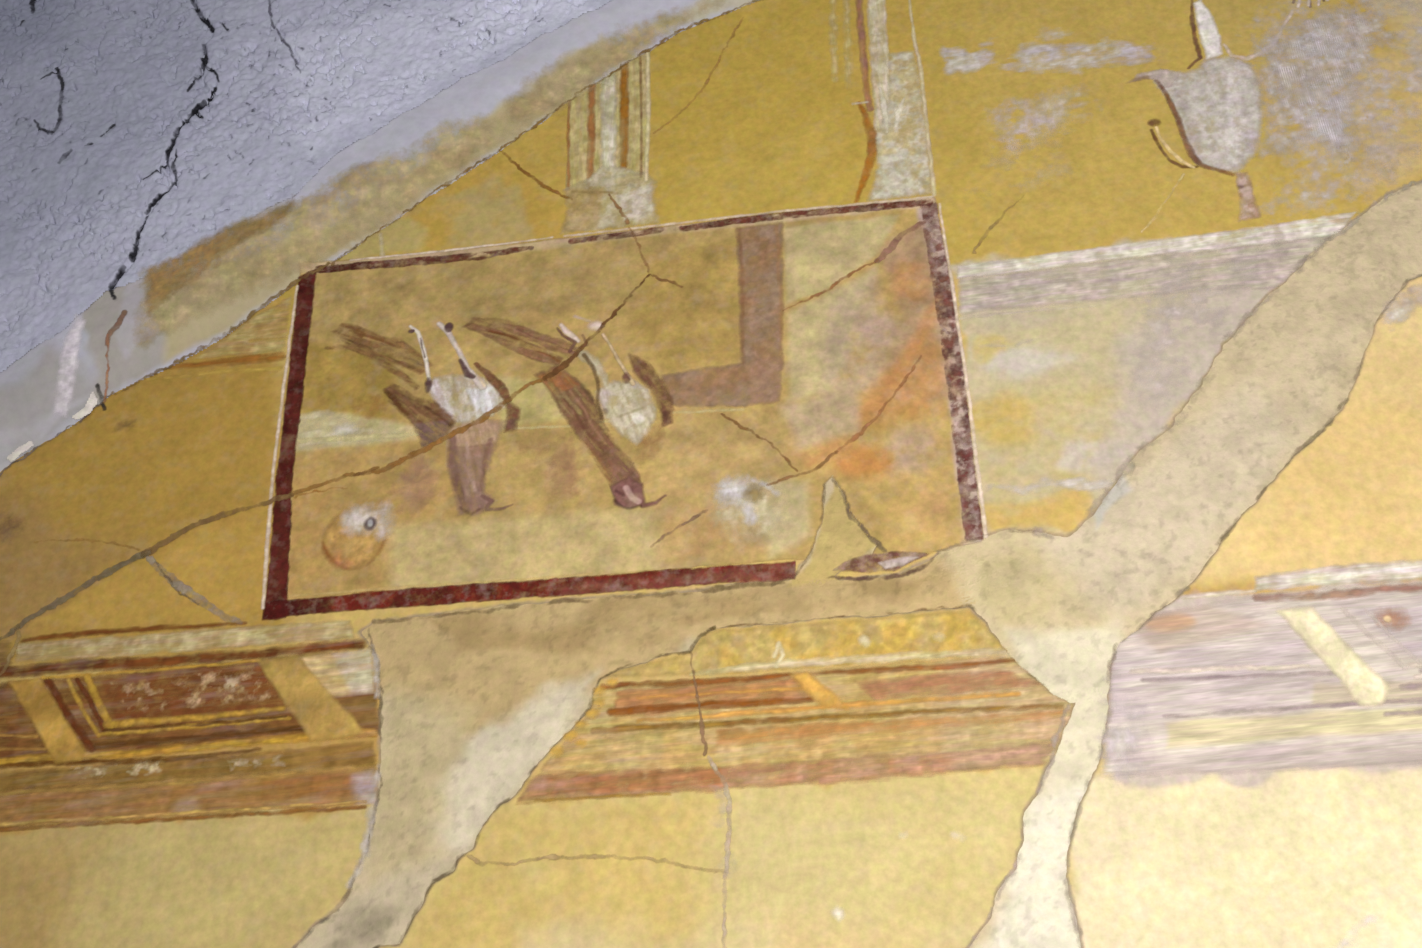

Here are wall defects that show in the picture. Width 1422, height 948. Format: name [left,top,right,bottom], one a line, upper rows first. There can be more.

crack [0,0,759,476]
crack [783,221,926,311]
crack [973,206,1012,253]
peeling [7,441,34,462]
peeling [72,392,98,419]
crack [5,194,682,667]
crack [721,365,915,484]
crack [657,514,700,542]
spalling [296,182,1422,948]
crack [643,671,732,937]
crack [467,854,608,865]